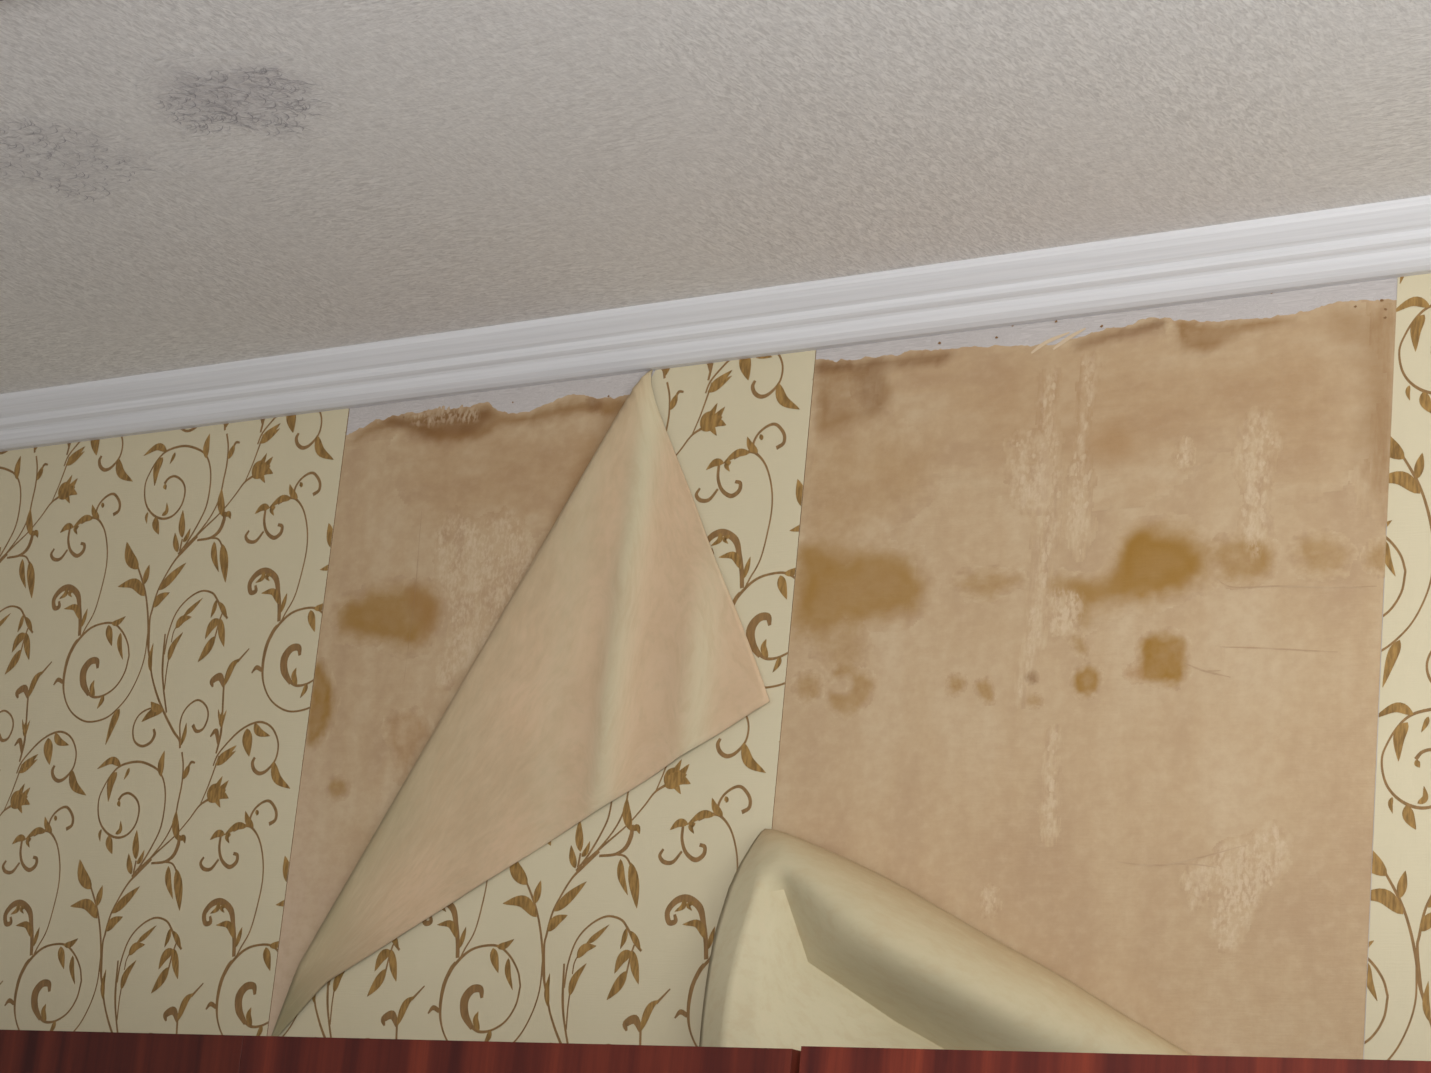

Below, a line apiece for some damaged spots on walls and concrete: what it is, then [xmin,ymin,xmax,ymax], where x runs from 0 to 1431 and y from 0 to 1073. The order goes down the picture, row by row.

mould [136,51,351,151]
damp [788,299,1397,722]
damp [328,574,446,659]
damp [305,655,341,753]
peeling [772,278,1397,1059]